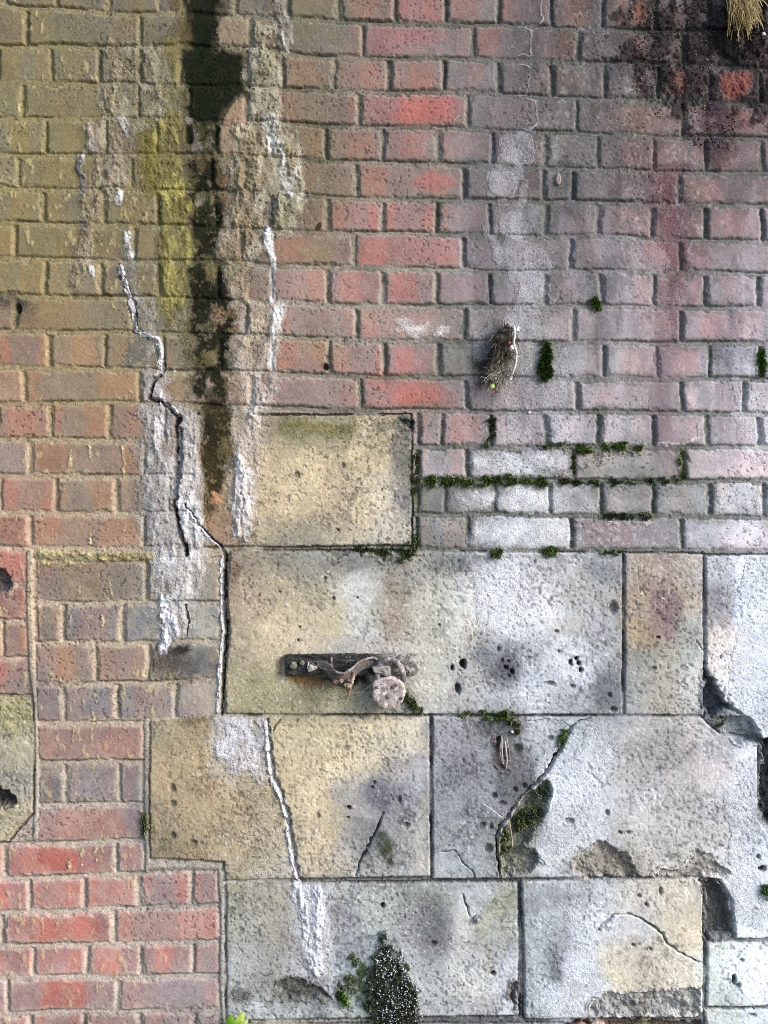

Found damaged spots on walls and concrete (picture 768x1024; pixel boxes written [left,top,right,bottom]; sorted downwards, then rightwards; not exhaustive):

leakage [67,0,312,655]
crack [118,264,231,714]
spalling [608,599,620,616]
crack [263,719,301,880]
crack [495,718,588,876]
spalling [699,654,768,826]
crack [598,912,701,962]
spalling [570,830,738,945]